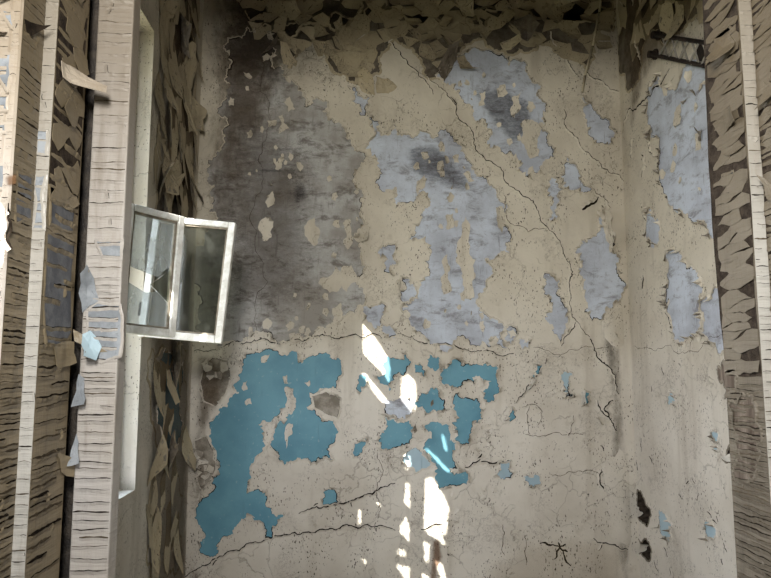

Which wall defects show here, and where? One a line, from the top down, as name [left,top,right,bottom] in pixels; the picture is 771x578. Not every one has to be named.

peeling [37,128,50,156]
peeling [14,170,124,368]
peeling [71,374,86,407]
peeling [61,61,107,93]
water stain [224,0,268,152]
crack [194,65,514,358]
peeling [146,0,741,578]
crack [377,23,619,498]
peeling [641,204,764,488]
crack [185,454,396,578]
crack [421,523,445,532]
crack [524,535,571,566]